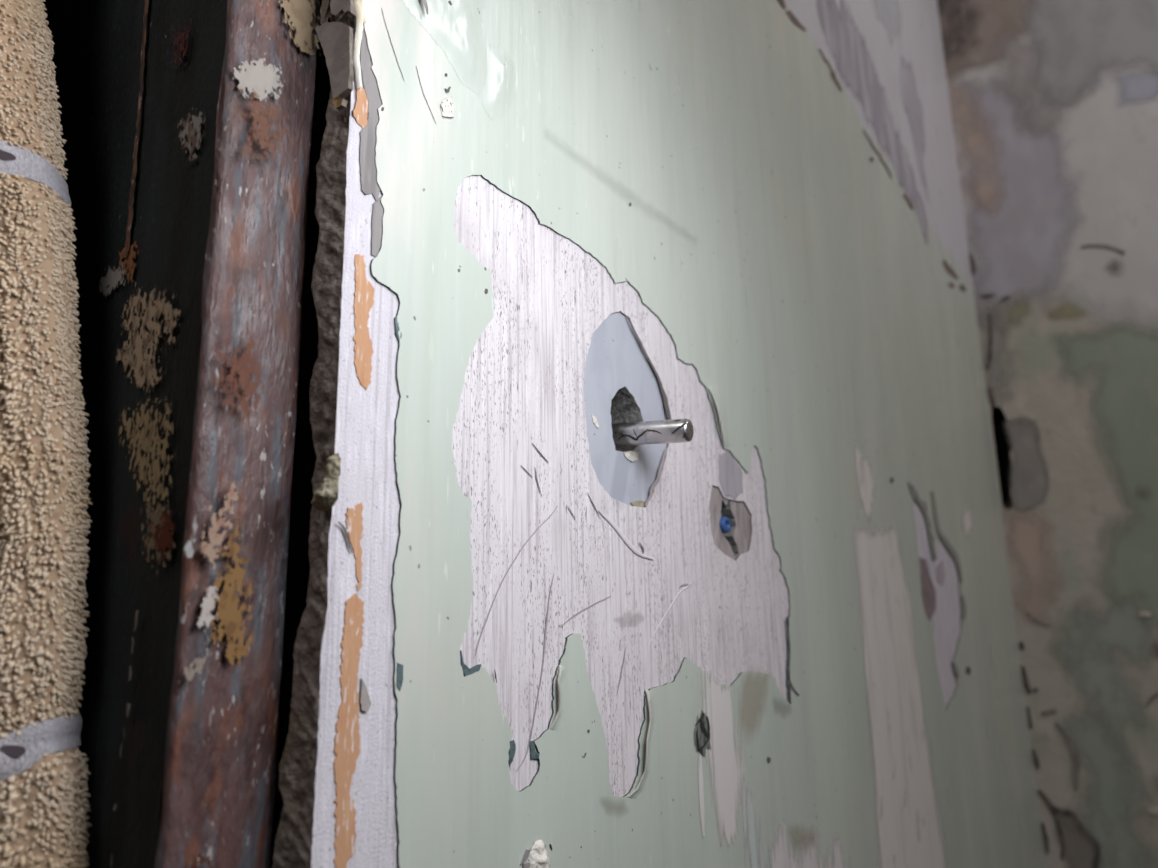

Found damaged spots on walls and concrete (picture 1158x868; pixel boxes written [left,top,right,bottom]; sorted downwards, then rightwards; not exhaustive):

corrosion [236,88,290,161]
peeling [440,73,454,118]
peeling [819,49,842,91]
peeling [943,260,966,292]
corrosion [212,331,267,417]
peeling [99,263,239,575]
flaking render [272,0,400,868]
peeling [452,175,789,799]
peeling [197,586,219,628]
corrosion [205,514,254,669]
peeling [890,477,971,707]
peeling [184,643,212,681]